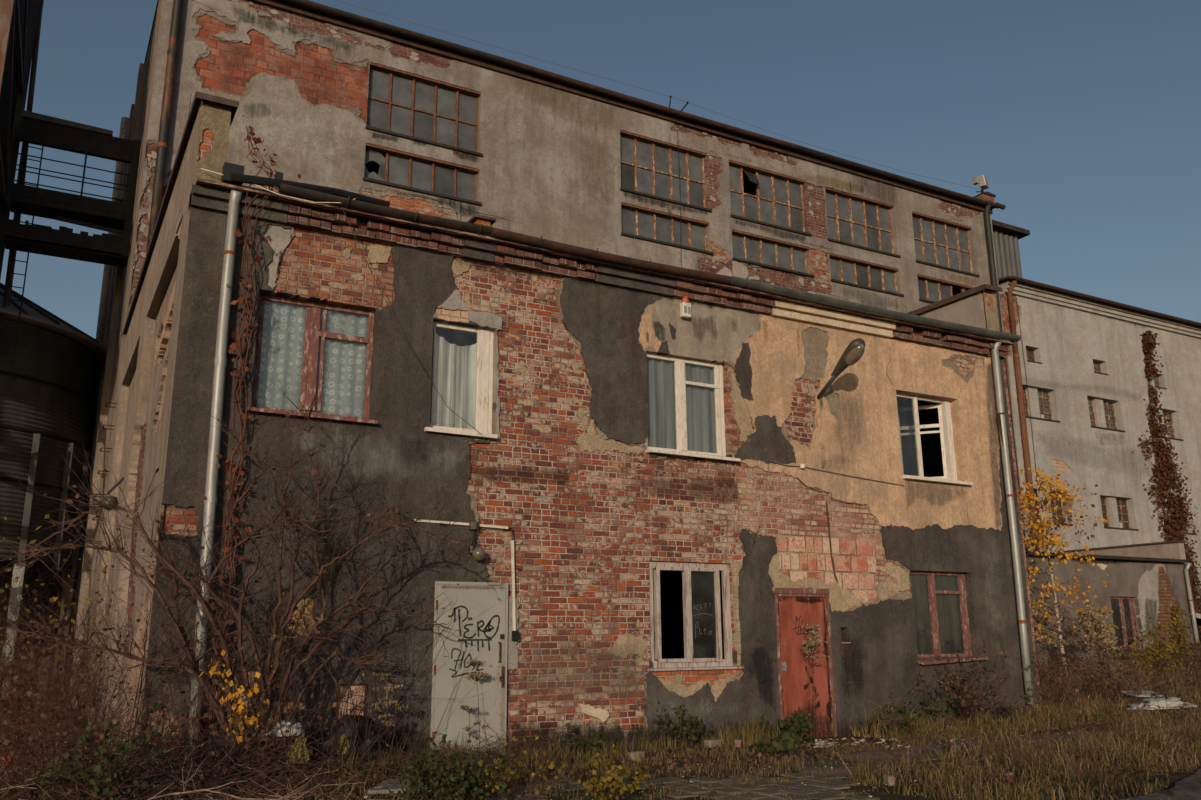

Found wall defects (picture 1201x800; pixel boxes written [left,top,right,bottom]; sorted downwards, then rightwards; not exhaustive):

flaking render [192,0,454,125]
flaking render [263,225,395,313]
flaking render [359,186,460,221]
flaking render [670,123,797,211]
flaking render [695,182,849,301]
flaking render [433,257,912,756]
spalling [1134,563,1185,667]